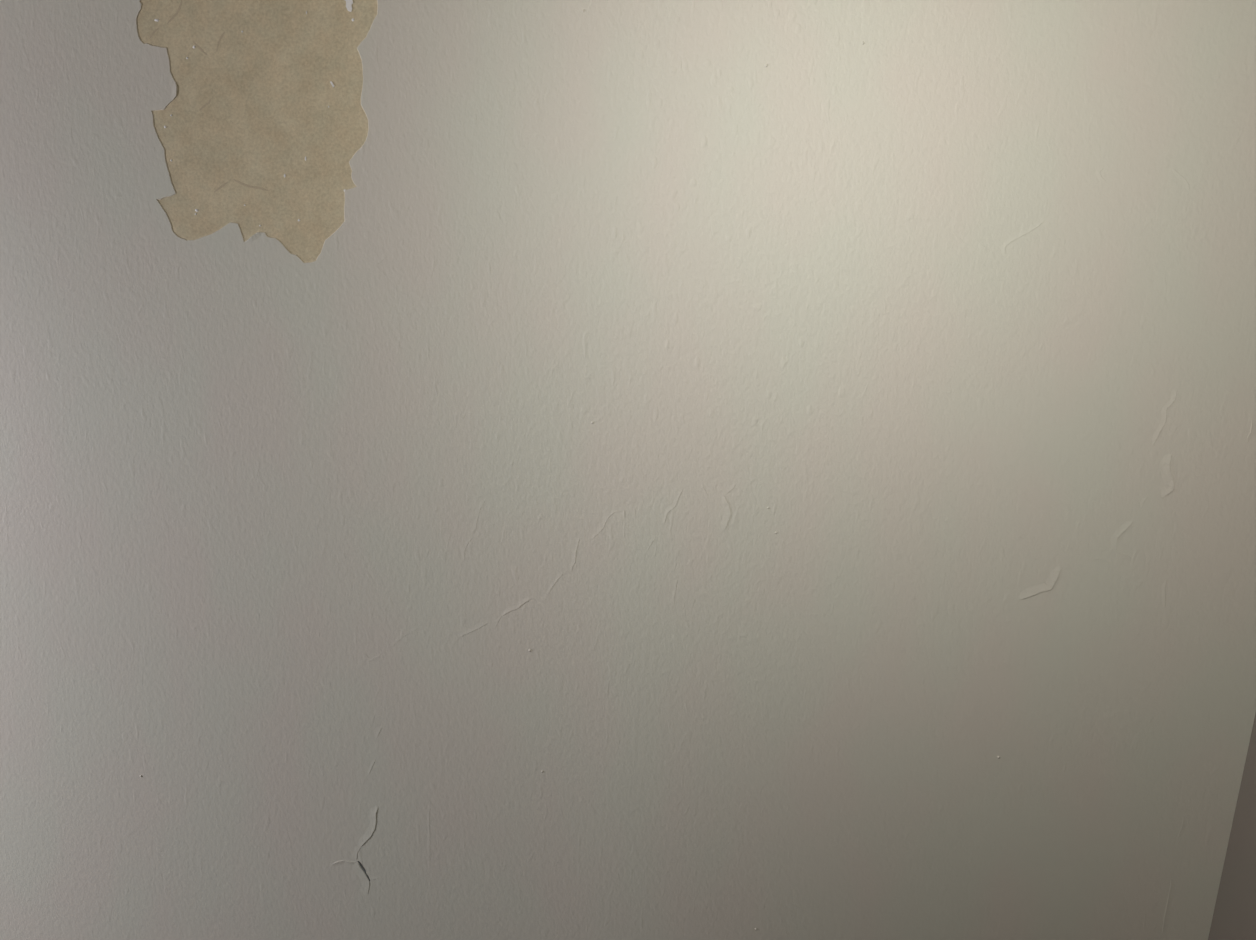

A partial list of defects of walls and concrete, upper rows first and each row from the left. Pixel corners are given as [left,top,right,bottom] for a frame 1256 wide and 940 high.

peeling [136,0,378,263]